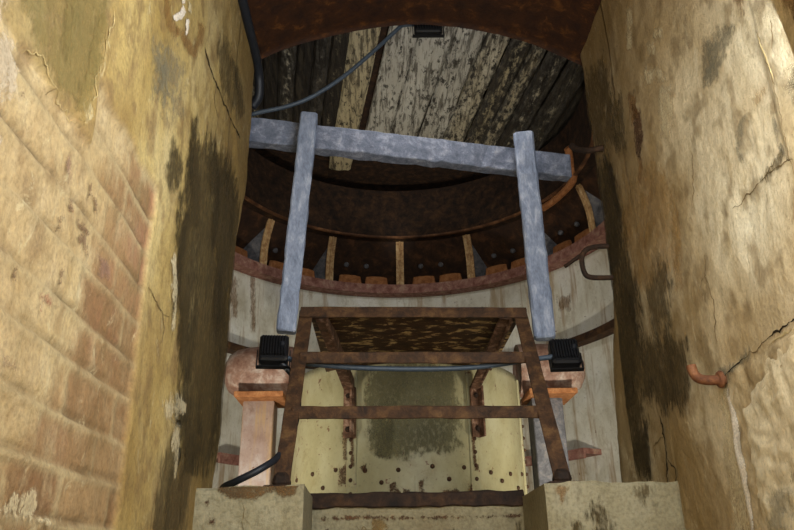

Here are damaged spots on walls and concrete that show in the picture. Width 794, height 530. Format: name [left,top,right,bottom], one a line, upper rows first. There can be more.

peeling [173,0,192,36]
crack [733,21,794,208]
water stain [153,117,240,530]
water stain [585,59,690,502]
crack [725,319,794,375]
water stain [571,501,612,530]
water stain [719,353,754,530]